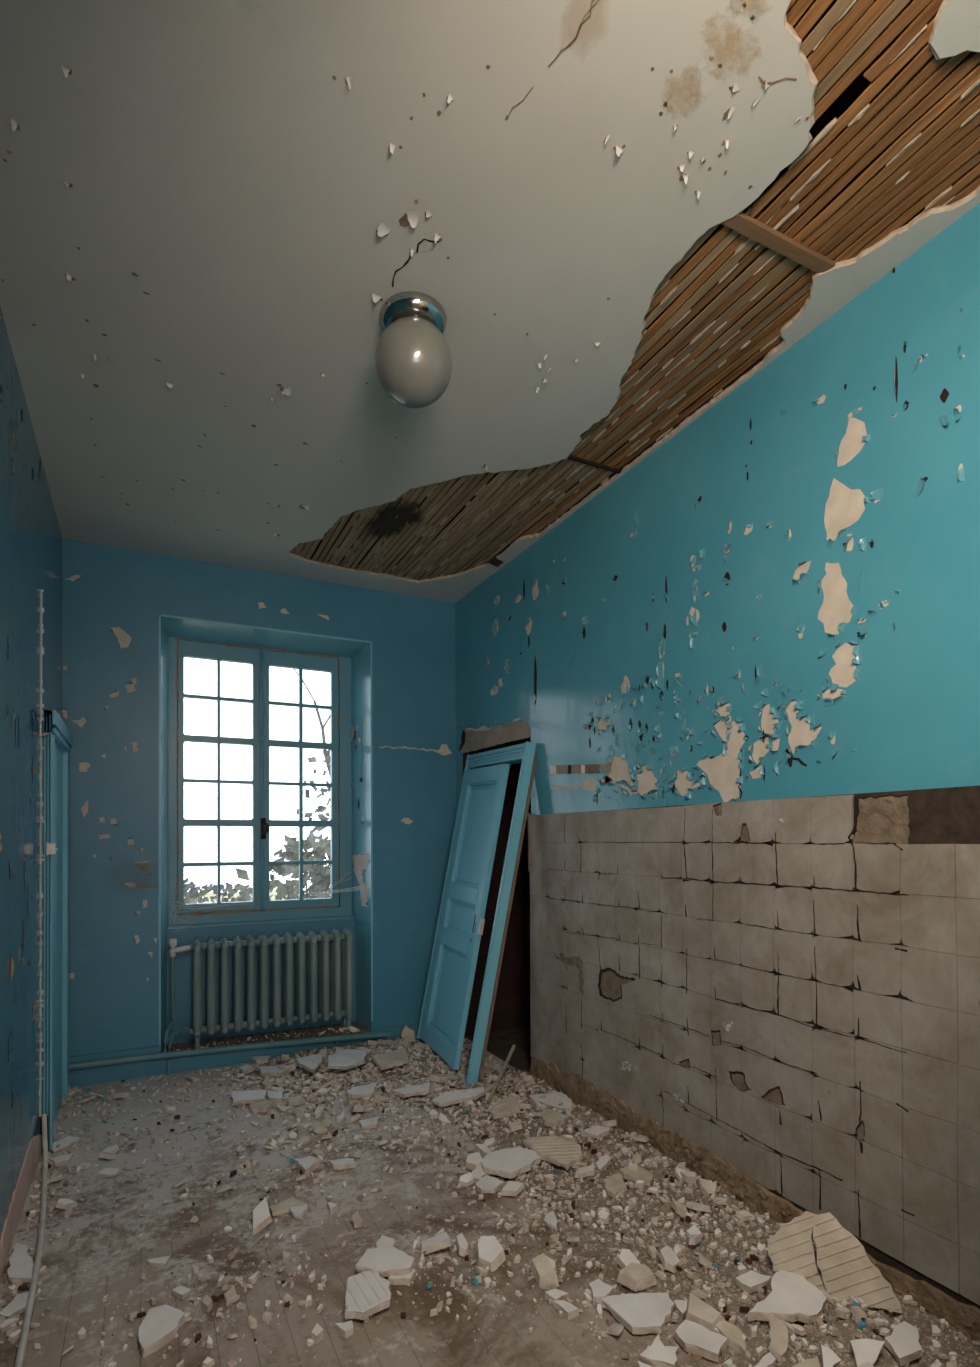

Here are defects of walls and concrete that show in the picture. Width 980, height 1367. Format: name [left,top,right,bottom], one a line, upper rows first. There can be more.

crack [507,0,600,119]
peeling [677,138,730,199]
peeling [376,199,450,259]
peeling [892,340,928,418]
peeling [938,388,962,426]
water stain [368,503,420,536]
peeling [487,557,566,705]
peeling [583,406,900,816]
spalling [459,718,531,753]
spalling [849,794,910,844]
spalling [0,590,50,1117]
spalling [554,955,635,1002]